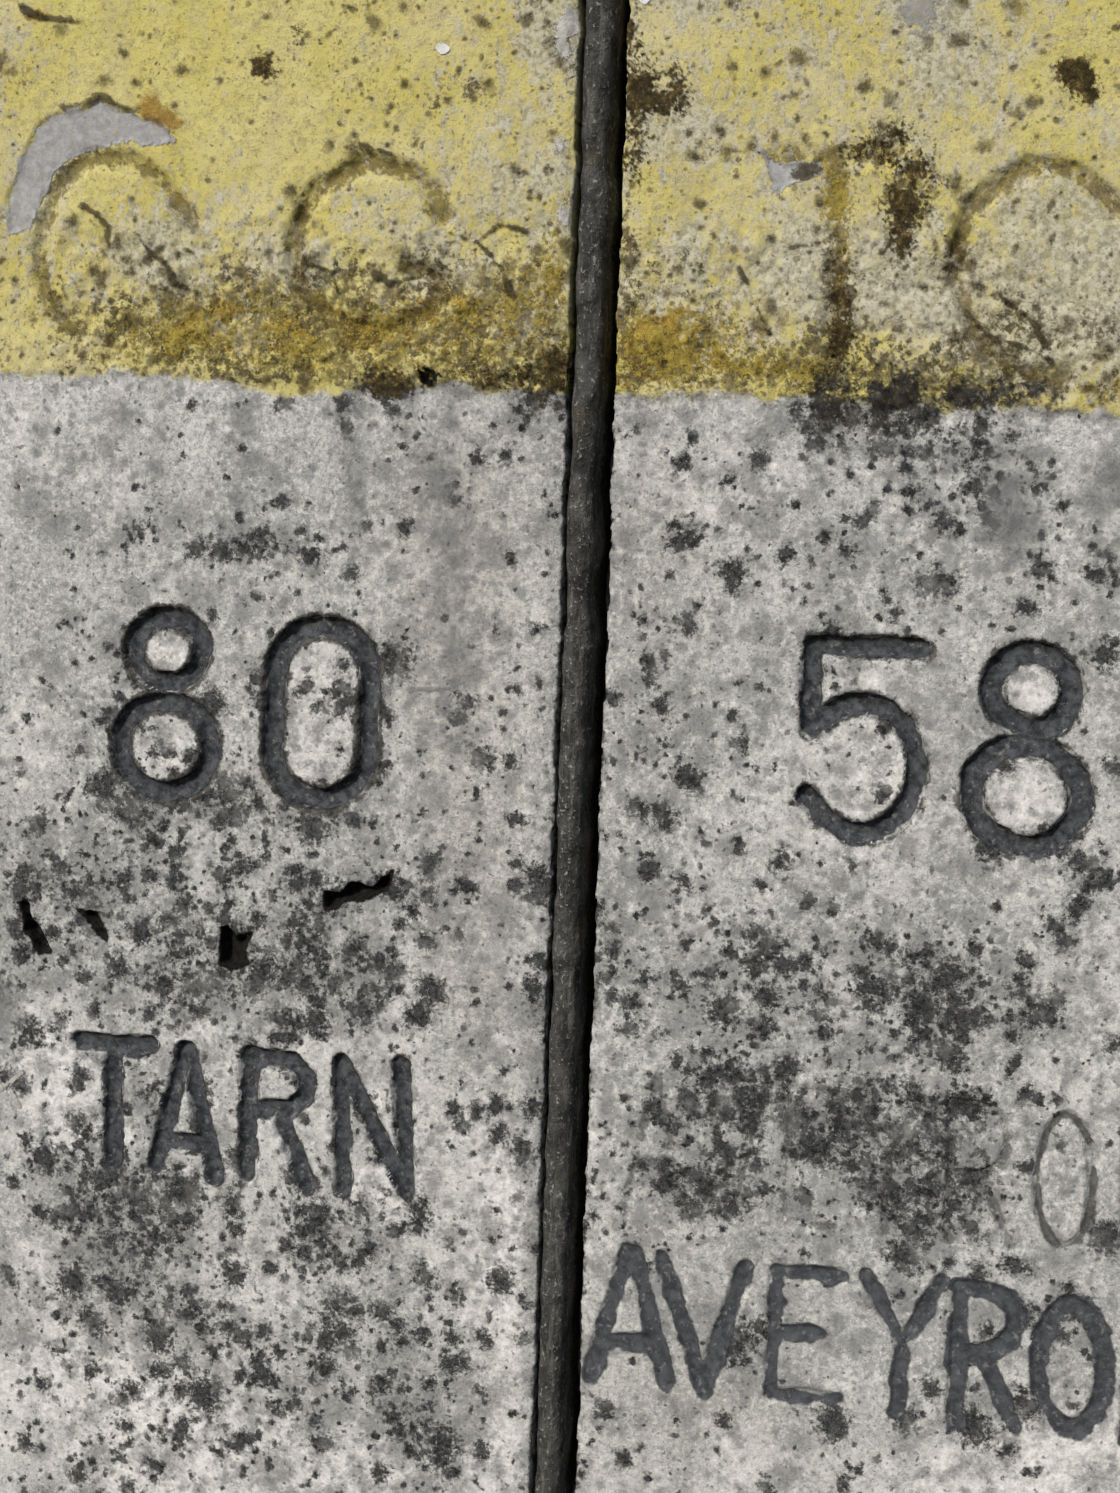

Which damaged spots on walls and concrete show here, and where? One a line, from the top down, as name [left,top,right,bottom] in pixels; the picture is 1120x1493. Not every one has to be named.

peeling [6,88,182,236]